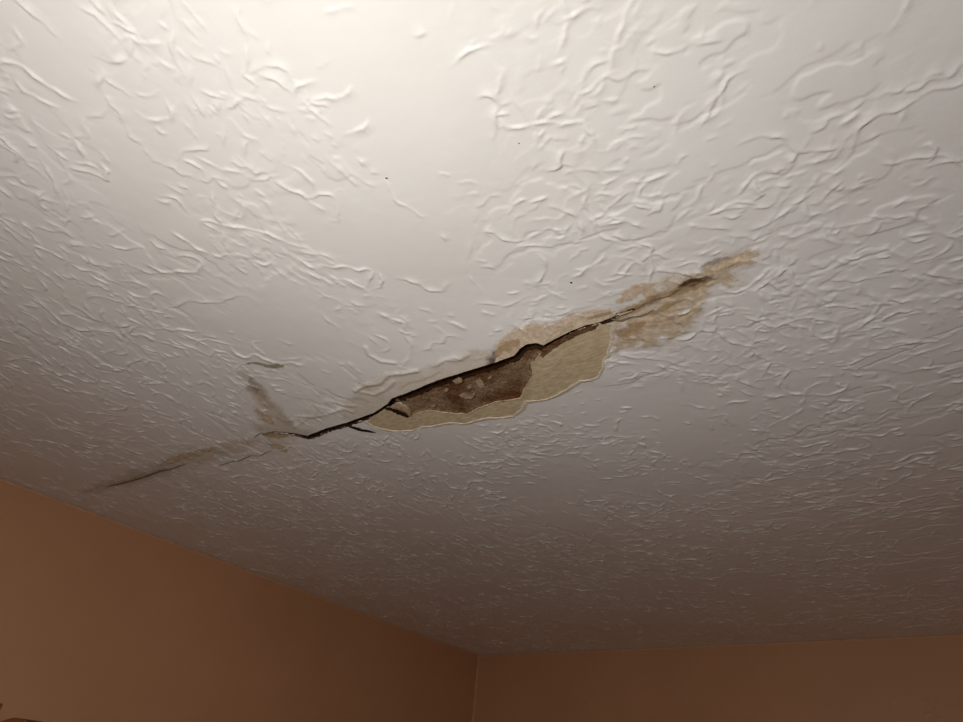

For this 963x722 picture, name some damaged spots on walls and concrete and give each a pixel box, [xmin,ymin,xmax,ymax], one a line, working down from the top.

leakage [495,252,758,362]
crack [218,282,698,467]
peeling [363,324,616,432]
crack [108,464,186,487]